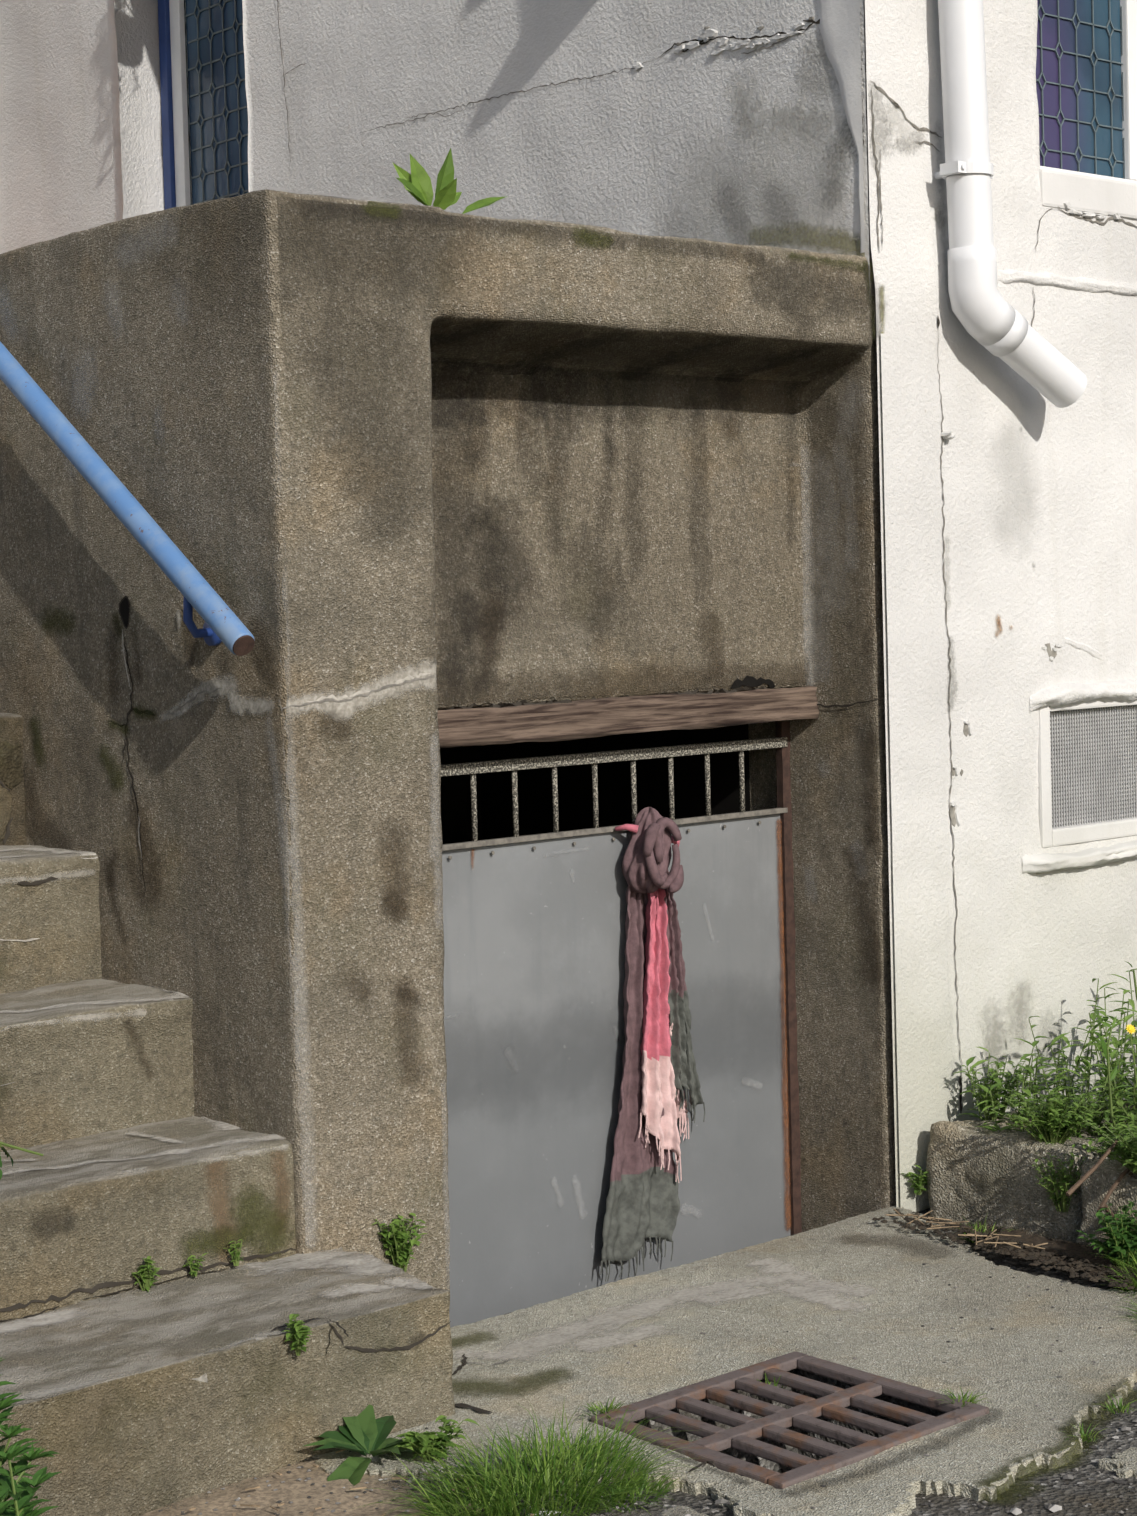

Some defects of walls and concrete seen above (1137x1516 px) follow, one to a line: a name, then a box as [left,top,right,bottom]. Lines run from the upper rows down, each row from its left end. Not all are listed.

crack [361,16,820,133]
crack [861,69,940,253]
crack [1036,202,1137,246]
crack [101,629,155,886]
crack [0,1248,296,1321]
crack [271,1318,451,1352]